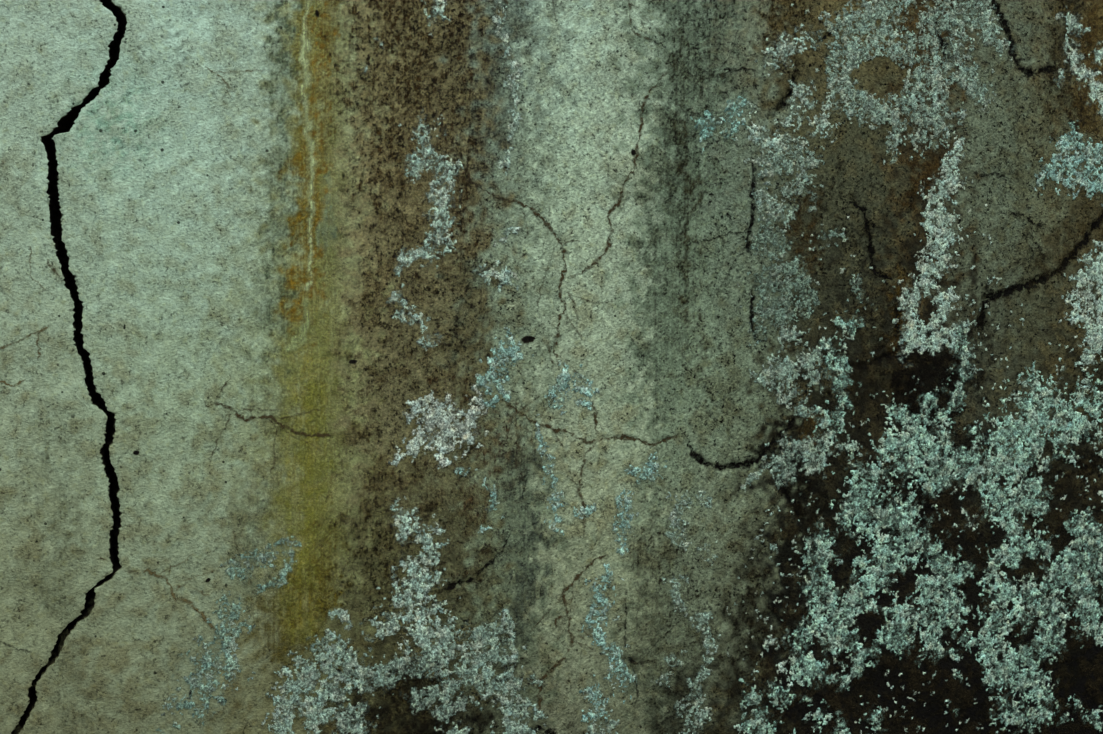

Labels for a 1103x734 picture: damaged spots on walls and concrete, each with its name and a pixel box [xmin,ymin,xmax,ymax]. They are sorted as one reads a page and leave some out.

crack [0,0,238,734]
corrosion [249,0,350,663]
water stain [260,0,523,461]
corrosion [349,0,488,276]
corrosion [352,414,486,598]
water stain [634,0,743,430]
water stain [637,156,1103,734]
crack [849,199,908,370]
crack [978,212,1103,333]
water stain [979,0,1103,312]
crack [991,0,1103,77]
water stain [334,652,496,734]